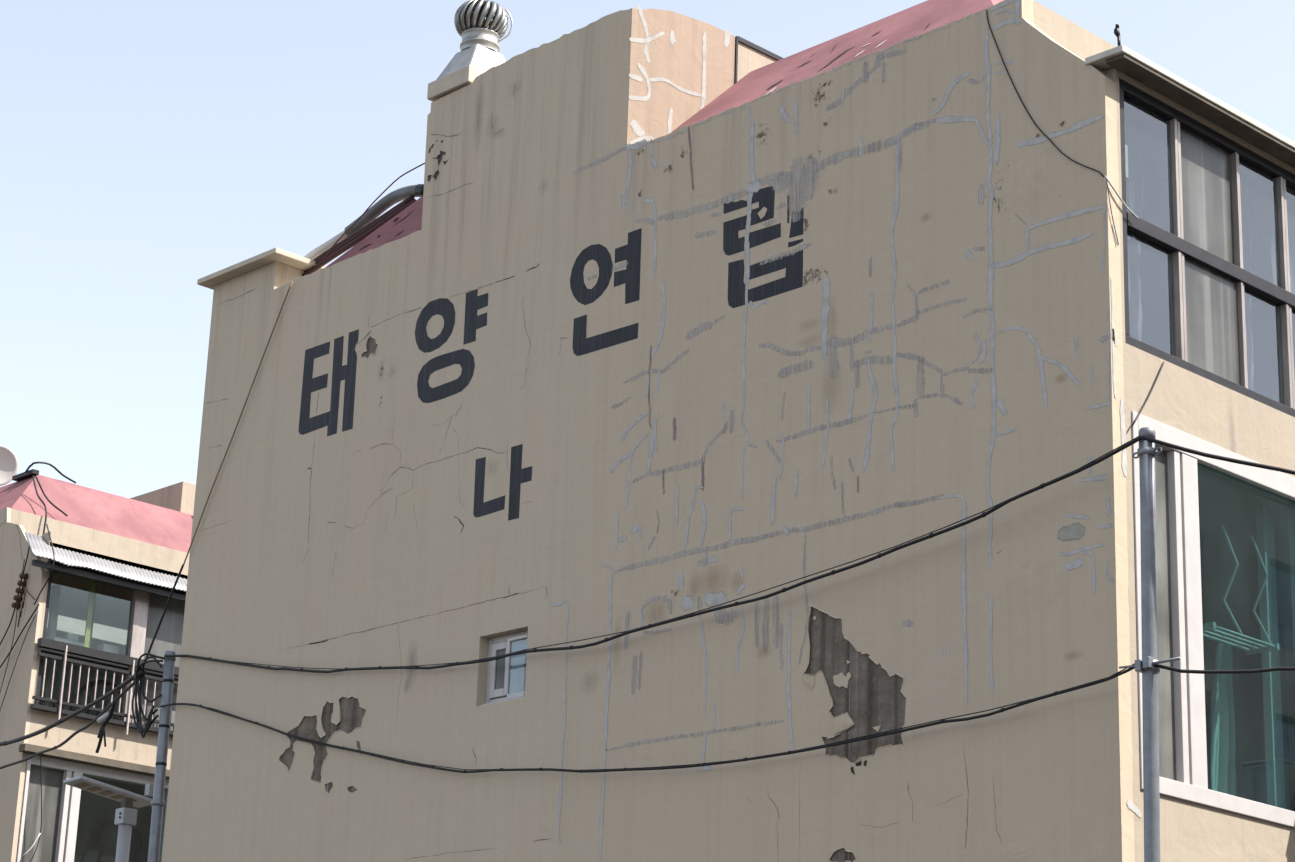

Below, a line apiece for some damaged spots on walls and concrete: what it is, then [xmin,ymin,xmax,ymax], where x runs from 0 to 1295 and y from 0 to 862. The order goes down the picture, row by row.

peeling [428,140,447,183]
peeling [802,605,906,774]
peeling [279,695,367,793]
peeling [829,847,857,862]